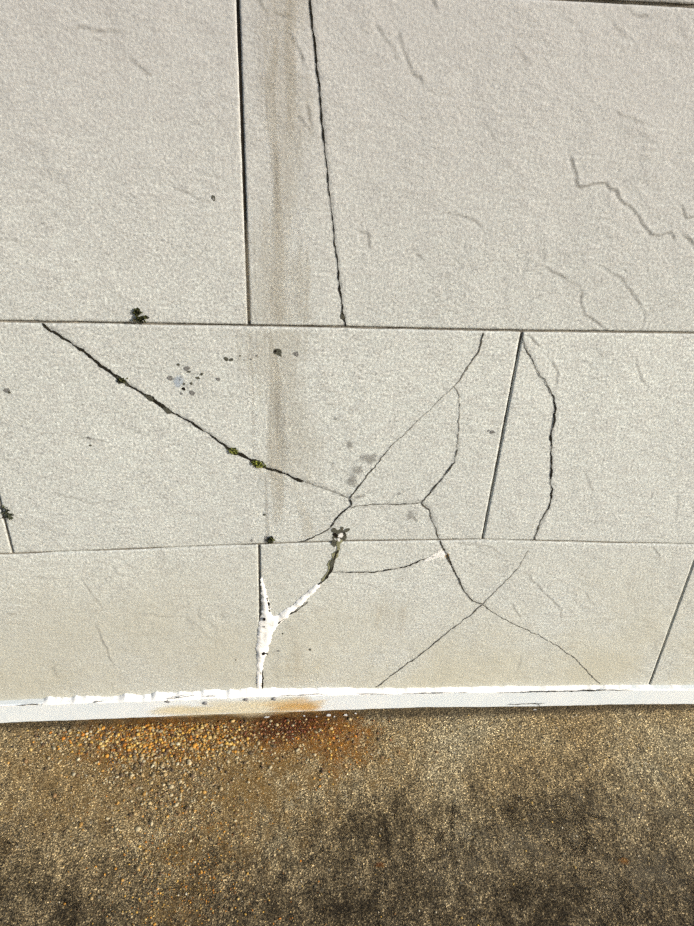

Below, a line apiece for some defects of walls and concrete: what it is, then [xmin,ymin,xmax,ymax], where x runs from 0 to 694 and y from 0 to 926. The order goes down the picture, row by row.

crack [309,0,346,326]
crack [42,323,621,709]
corrosion [115,700,369,771]